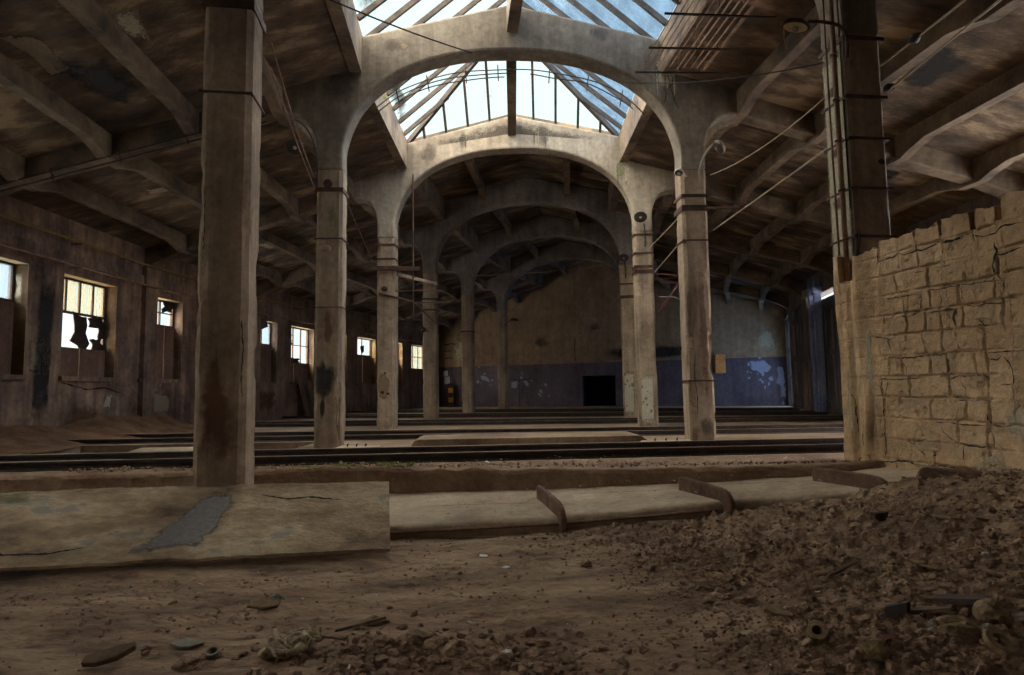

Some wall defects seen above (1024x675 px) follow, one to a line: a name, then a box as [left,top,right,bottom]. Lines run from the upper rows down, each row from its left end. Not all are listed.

water stain [29,284,55,410]
crack [851,222,1022,469]
peeling [747,357,786,405]
crack [0,547,84,556]
peeling [130,492,233,552]
crack [265,493,340,501]